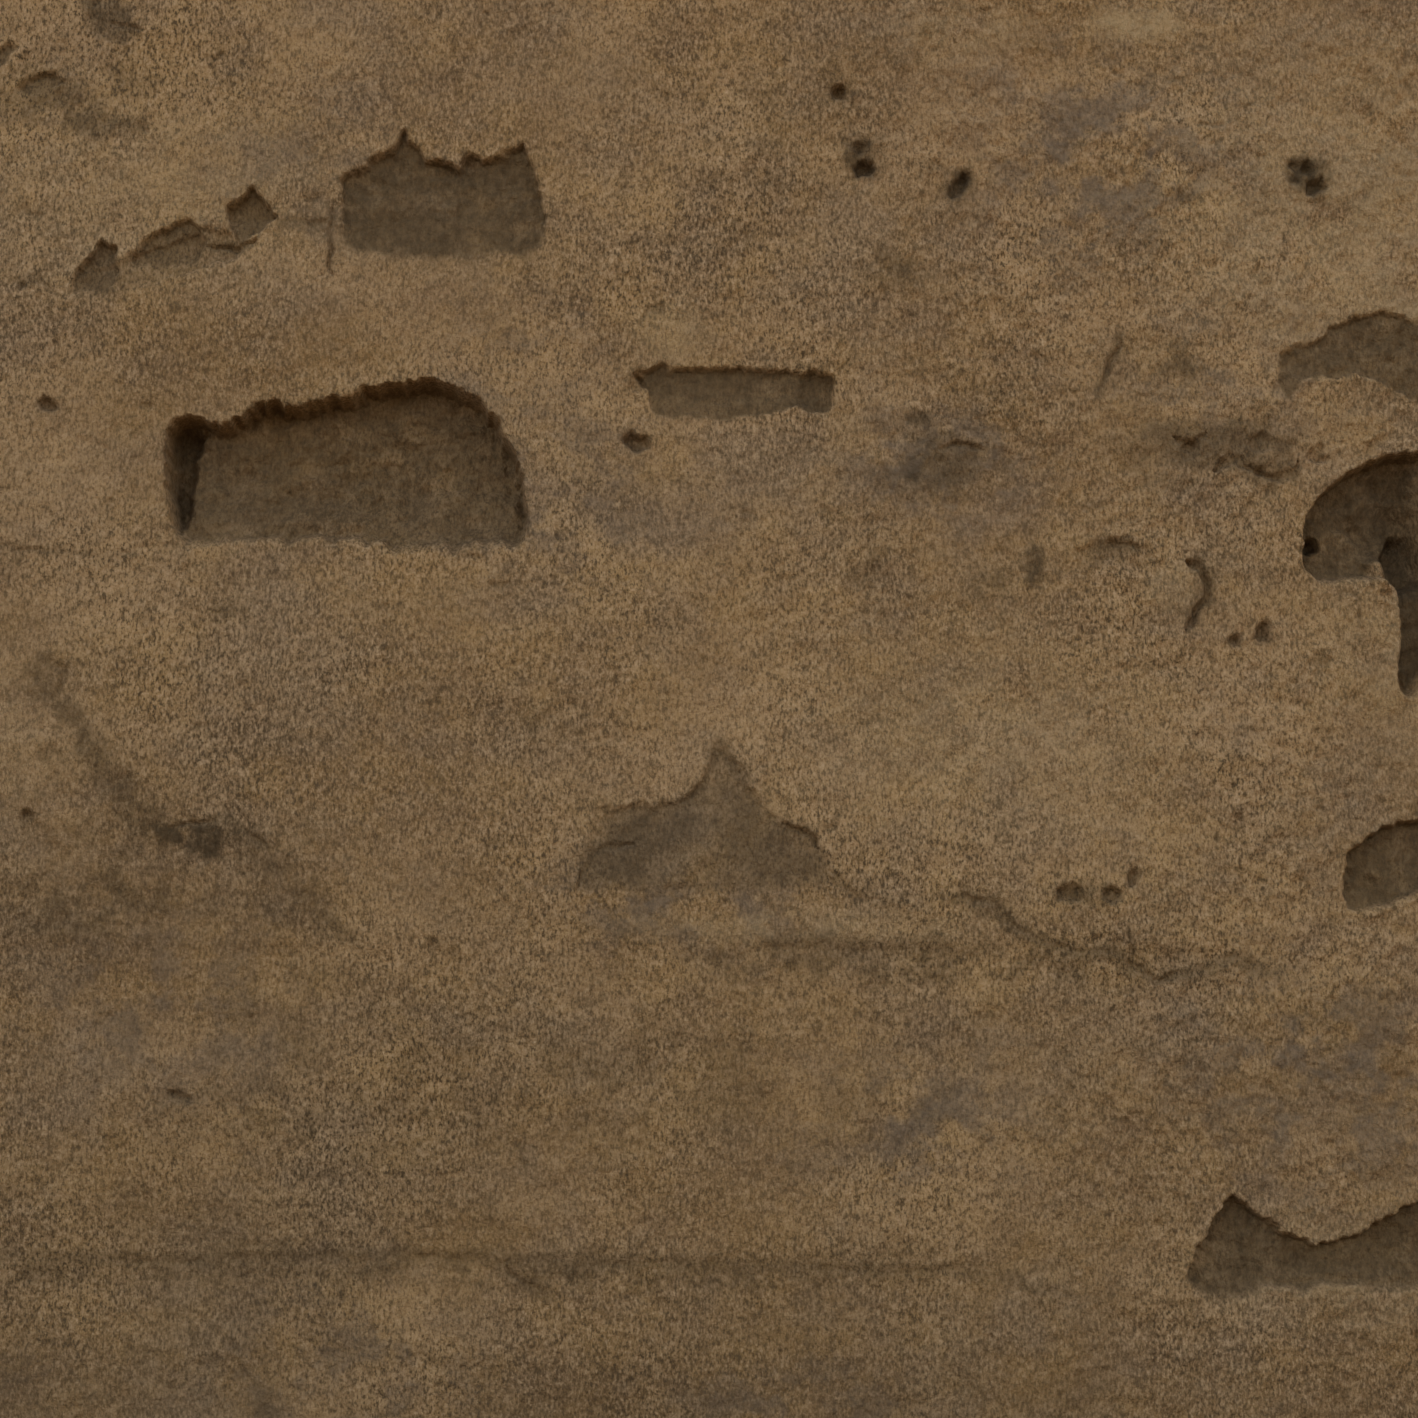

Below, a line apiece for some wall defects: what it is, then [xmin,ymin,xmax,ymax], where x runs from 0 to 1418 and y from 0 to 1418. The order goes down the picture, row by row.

spalling [4,128,554,306]
spalling [162,376,537,565]
spalling [620,358,844,455]
spalling [1128,307,1418,591]
spalling [572,737,876,912]
crack [736,886,1320,991]
spalling [1340,816,1418,916]
spalling [1179,1195,1418,1313]